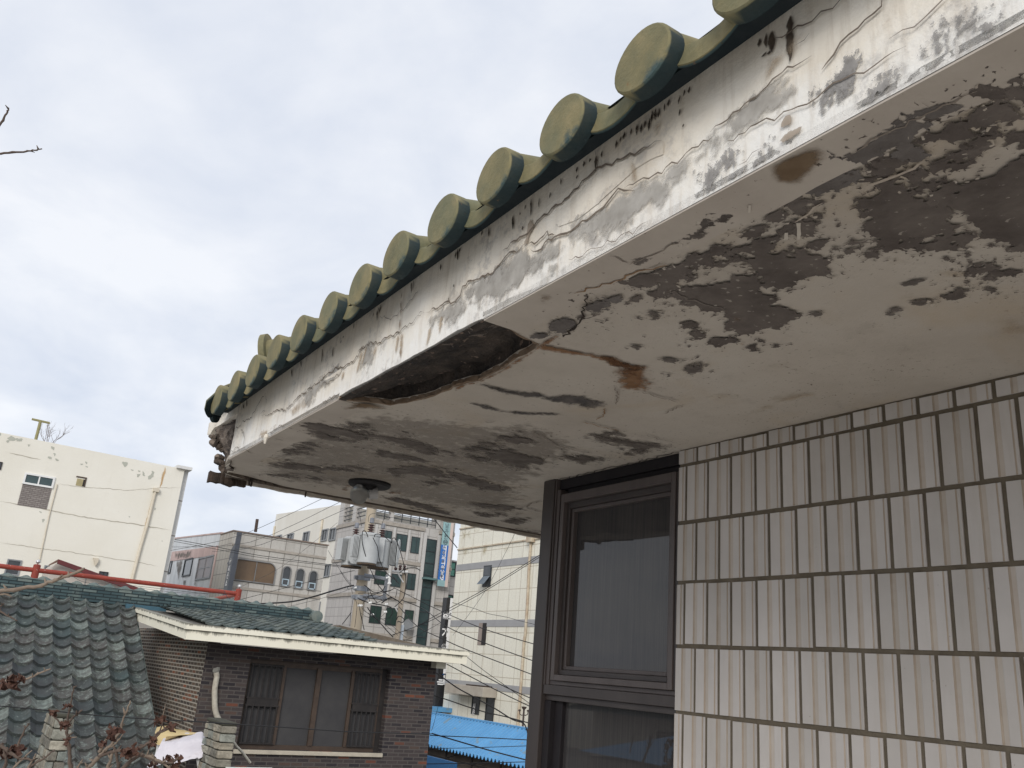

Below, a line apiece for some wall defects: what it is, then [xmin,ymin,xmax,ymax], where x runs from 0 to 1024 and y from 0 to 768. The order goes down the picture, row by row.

crack [229,0,943,453]
water stain [427,16,819,343]
peeling [586,73,1024,353]
water stain [292,344,375,414]
spalling [339,316,577,406]
water stain [470,385,602,415]
rust [456,336,651,390]
peeling [658,358,708,377]
peeling [208,420,604,492]
peeling [585,431,675,456]
peeling [473,503,537,533]